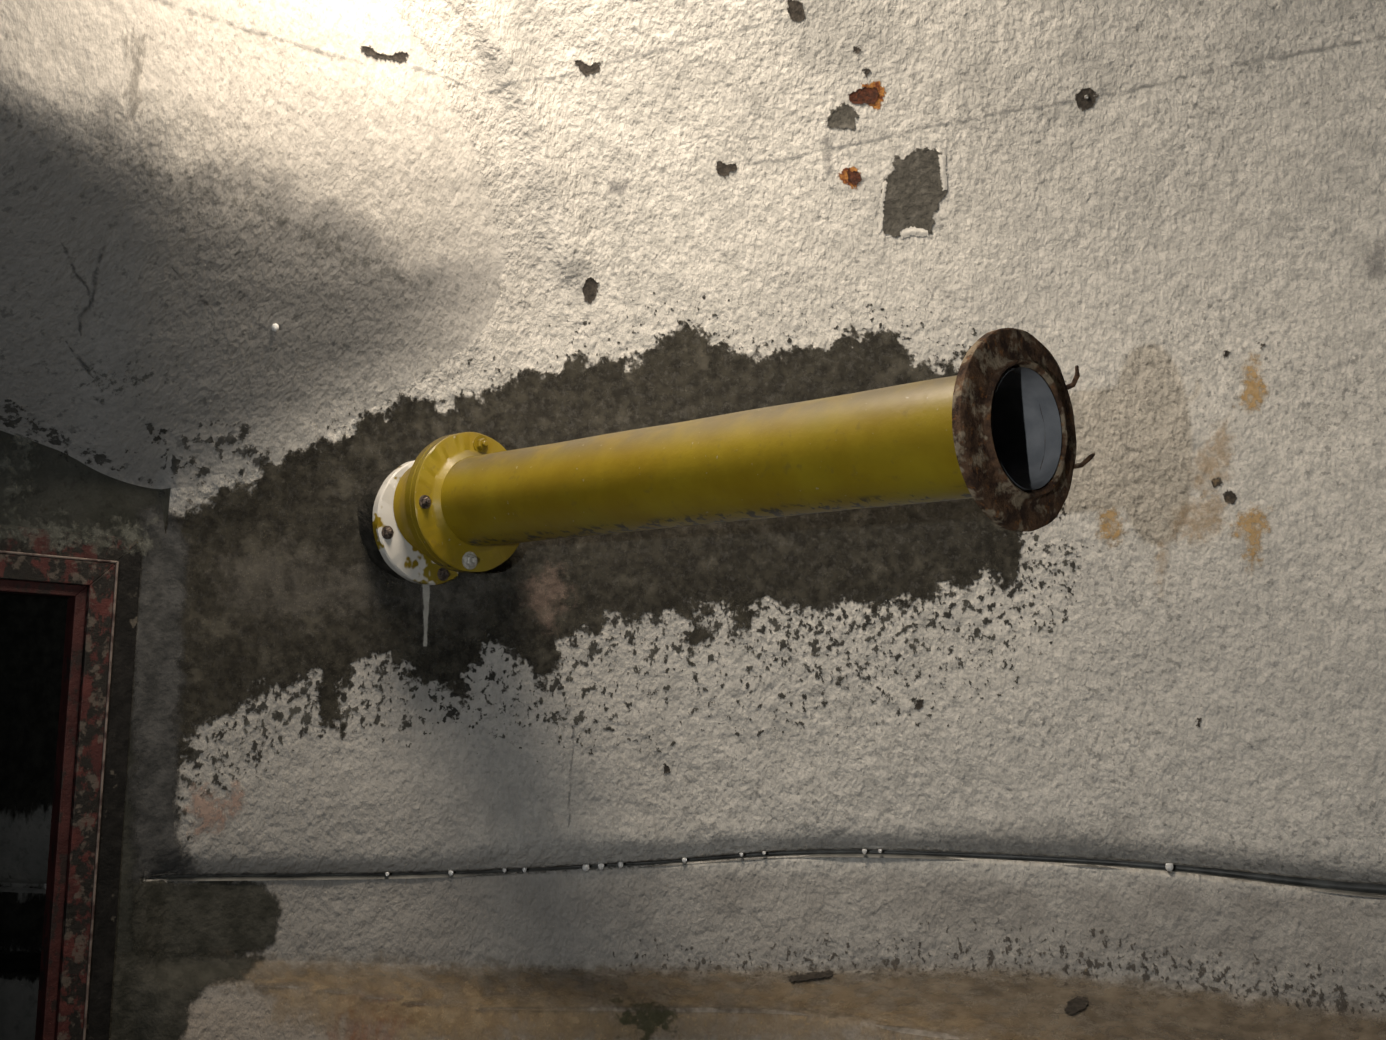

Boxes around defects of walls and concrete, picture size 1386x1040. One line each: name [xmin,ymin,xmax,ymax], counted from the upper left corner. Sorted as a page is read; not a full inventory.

crack [1240,37,1380,65]
corrosion [848,81,886,110]
crack [838,76,1184,147]
corrosion [838,166,862,189]
peeling [878,147,949,239]
corrosion [1240,359,1266,409]
corrosion [1234,508,1270,562]
leakage [0,292,1386,1040]